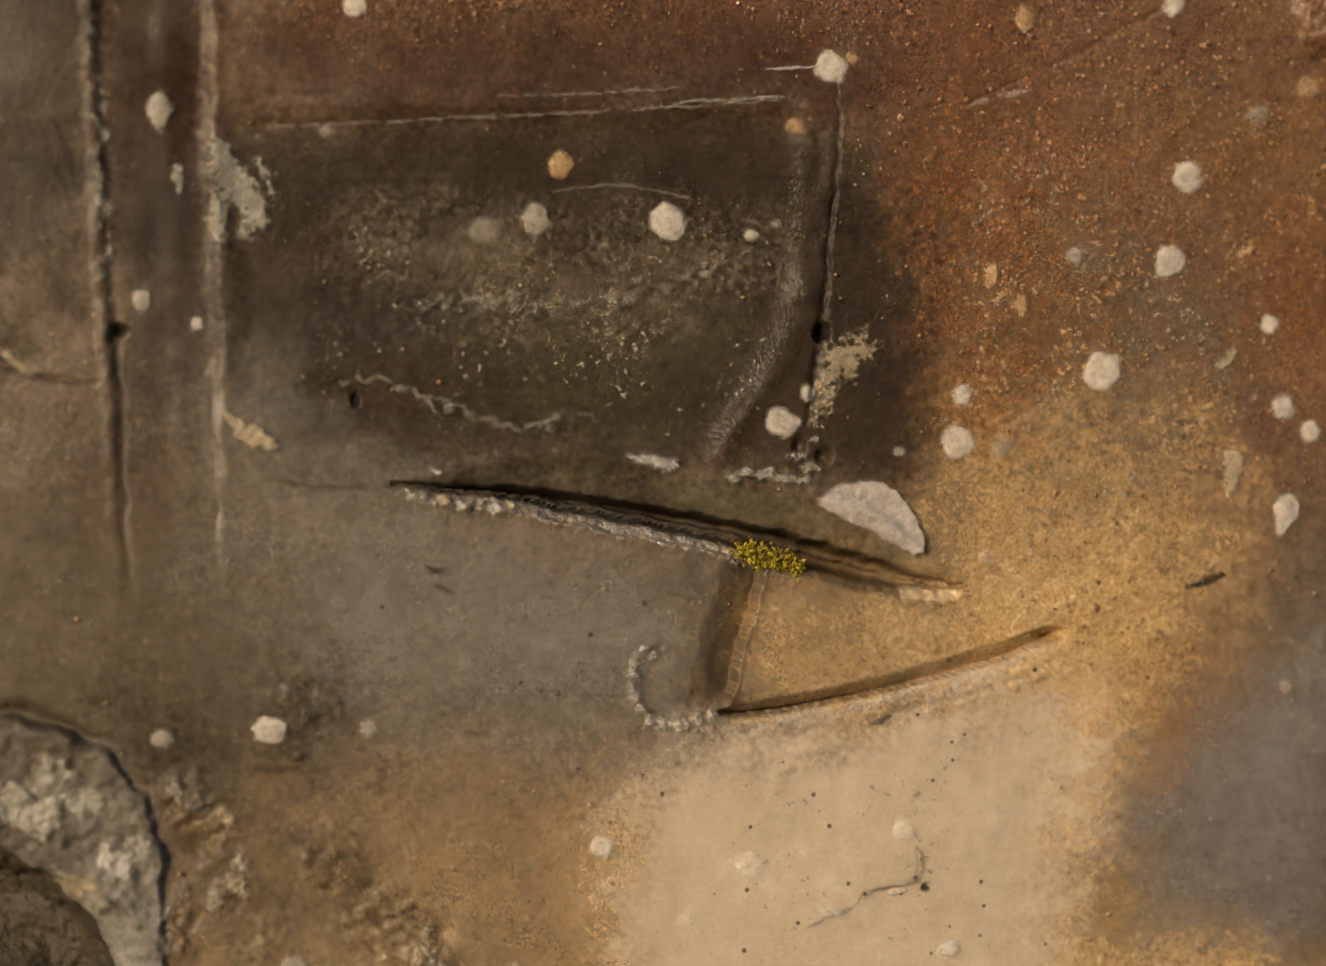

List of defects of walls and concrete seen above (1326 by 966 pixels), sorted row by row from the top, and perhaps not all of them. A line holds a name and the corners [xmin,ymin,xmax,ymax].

leakage [425,201,741,441]
leakage [640,457,676,467]
rust [268,0,1326,966]
spalling [0,750,171,966]